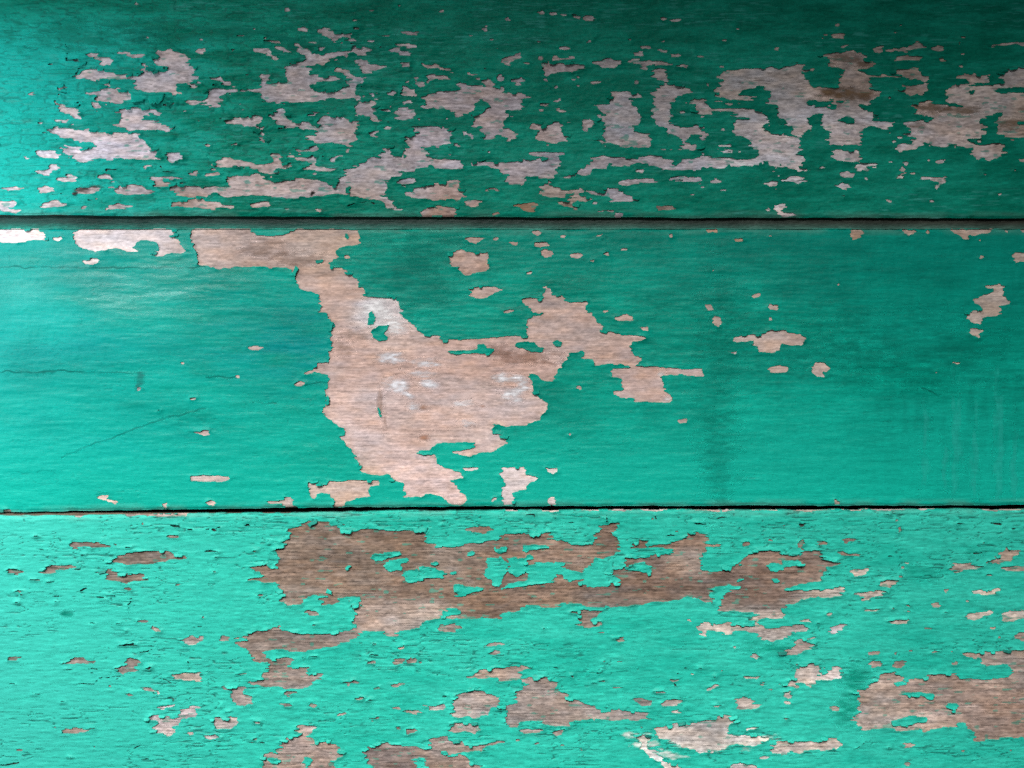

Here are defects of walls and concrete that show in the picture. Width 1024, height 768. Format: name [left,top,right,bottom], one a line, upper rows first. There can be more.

peeling [34,27,1024,218]
peeling [0,228,704,507]
peeling [733,330,806,353]
peeling [767,365,788,373]
peeling [812,362,830,377]
peeling [964,283,1010,338]
peeling [126,509,898,740]
peeling [259,725,346,768]
peeling [362,665,843,768]
peeling [851,609,1024,748]